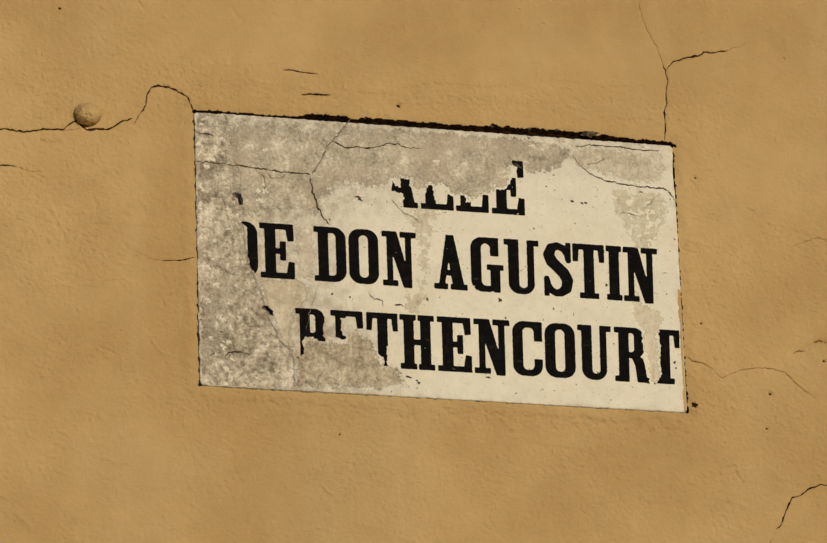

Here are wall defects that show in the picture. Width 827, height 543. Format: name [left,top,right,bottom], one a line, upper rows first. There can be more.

crack [577,0,744,165]
crack [0,84,193,143]
peeling [196,113,668,391]
crack [689,358,815,398]
crack [770,484,827,543]